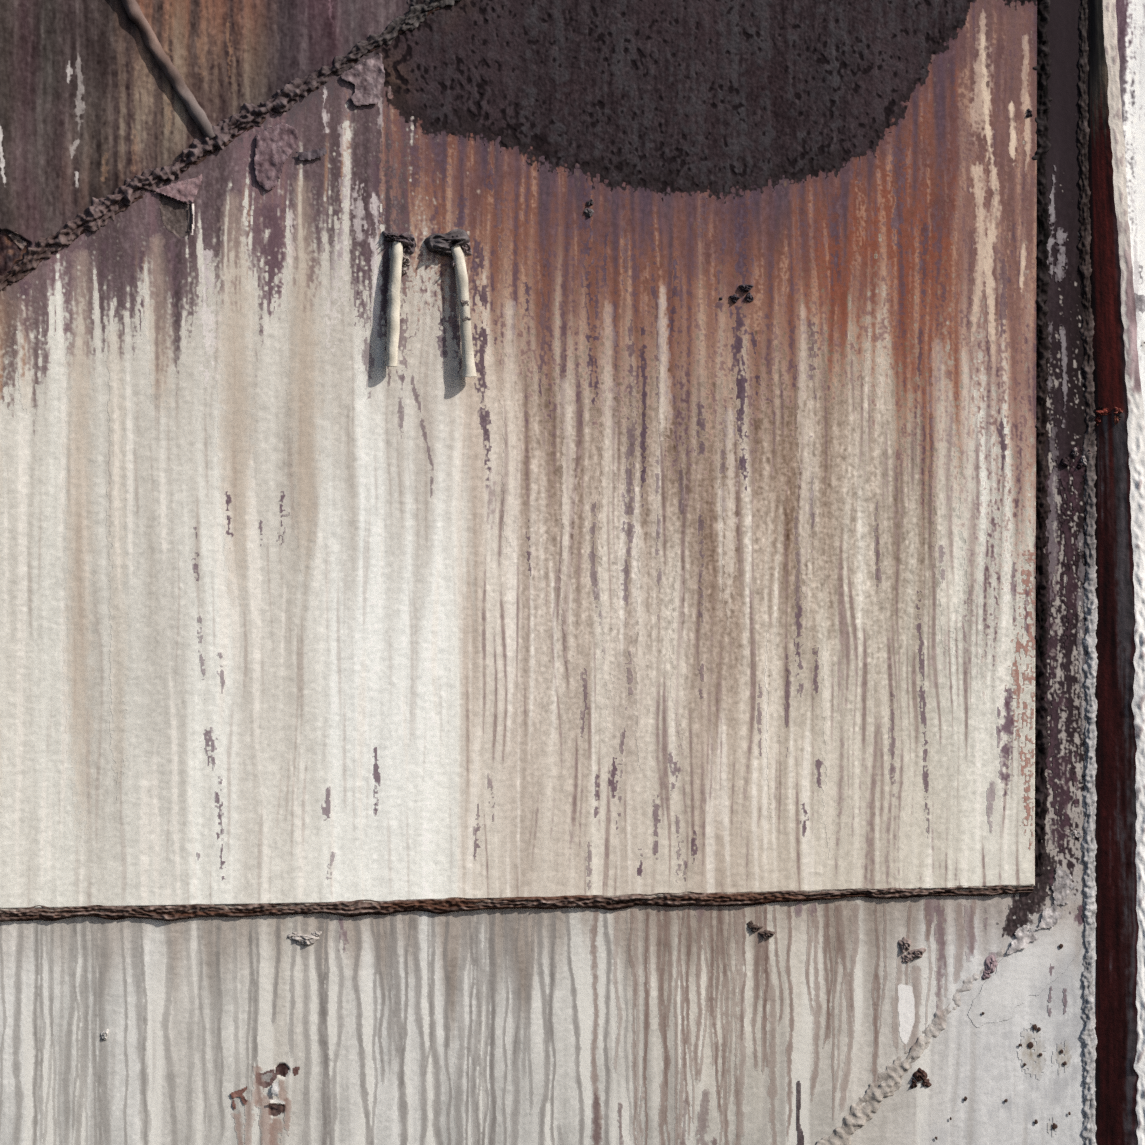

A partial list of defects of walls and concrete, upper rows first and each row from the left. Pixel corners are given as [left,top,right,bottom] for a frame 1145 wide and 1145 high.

damp [62,248,130,847]
damp [194,190,259,612]
damp [283,86,381,583]
rust [0,0,1037,860]
rust [0,445,1086,1017]
damp [557,377,577,681]
damp [594,300,620,728]
damp [655,284,674,451]
damp [794,304,814,612]
damp [925,8,1032,664]
peeling [230,1063,300,1145]
damp [0,898,979,1145]